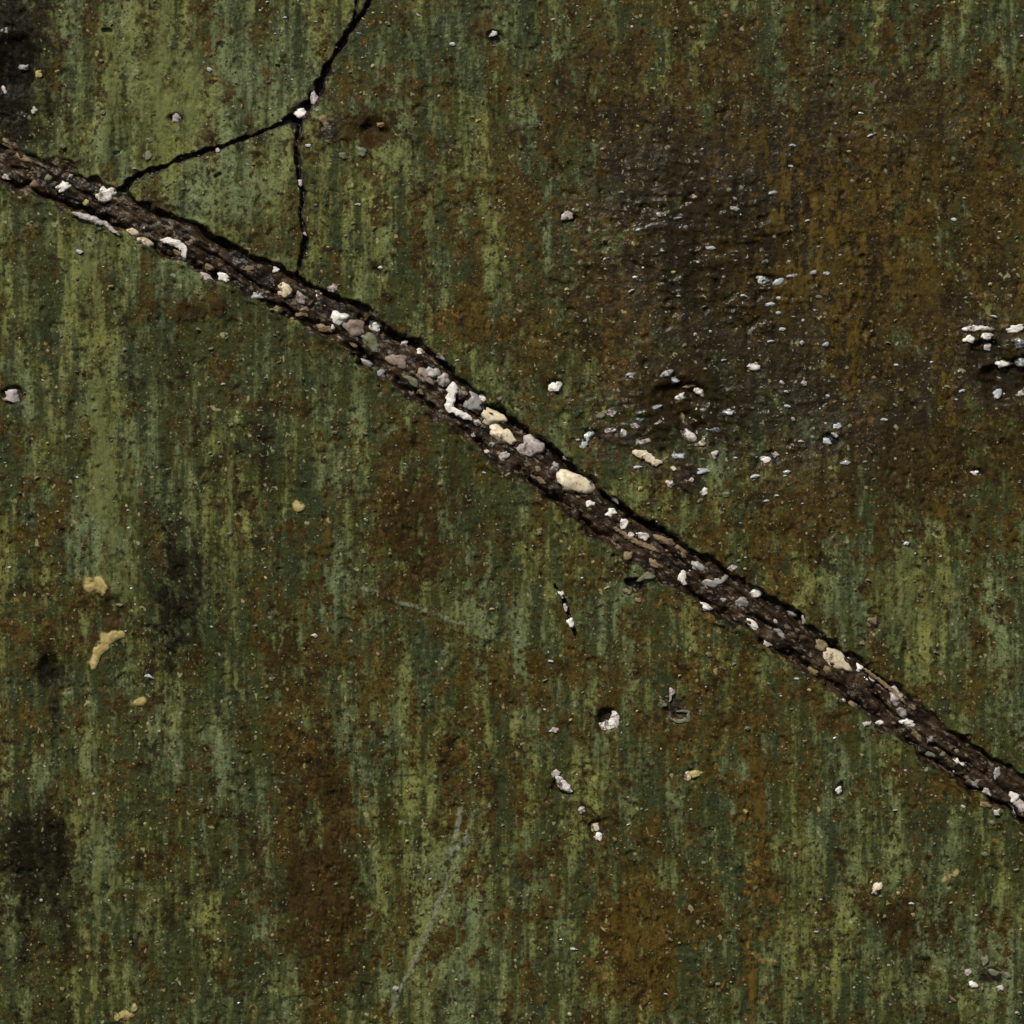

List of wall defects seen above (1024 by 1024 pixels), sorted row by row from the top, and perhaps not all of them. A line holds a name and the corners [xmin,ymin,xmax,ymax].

crack [289,0,372,236]
rust [348,69,403,154]
damp [622,125,797,314]
rust [724,117,958,410]
rust [387,440,462,601]
crack [0,112,1024,824]
rust [626,357,710,430]
damp [623,375,744,467]
damp [968,339,1024,466]
rust [88,598,129,655]
rust [267,609,299,682]
rust [885,897,938,961]